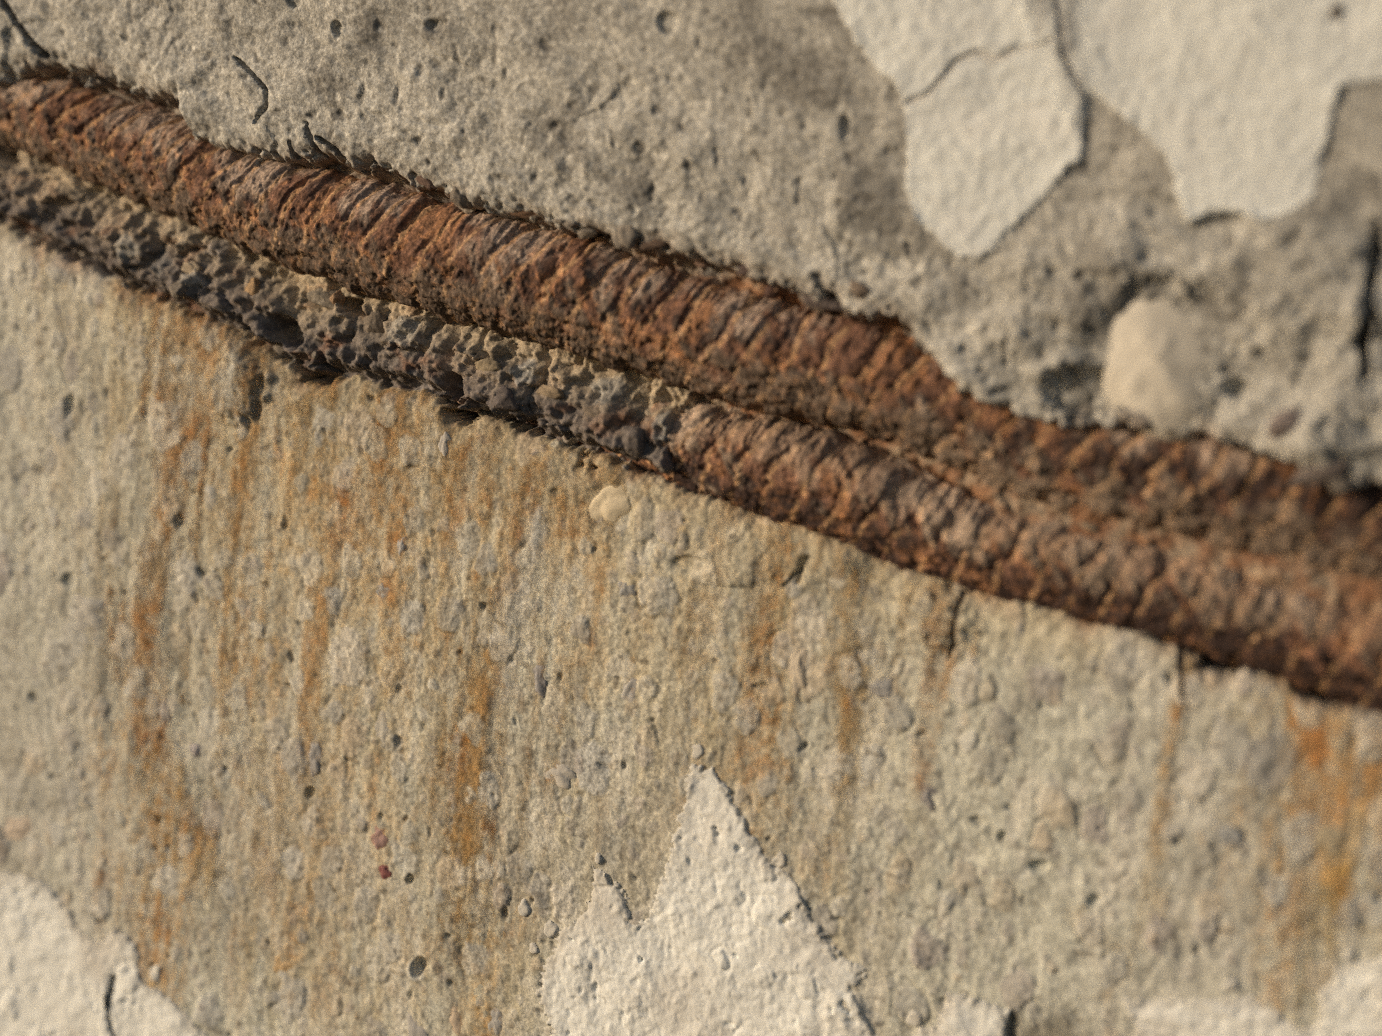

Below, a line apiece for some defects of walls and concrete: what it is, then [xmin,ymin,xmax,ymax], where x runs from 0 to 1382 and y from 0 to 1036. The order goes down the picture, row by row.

crack [0,0,52,60]
crack [904,0,1090,106]
peeling [0,0,1382,713]
crack [1356,220,1382,378]
corrosion [286,378,347,541]
corrosion [123,698,194,873]
corrosion [138,875,185,996]